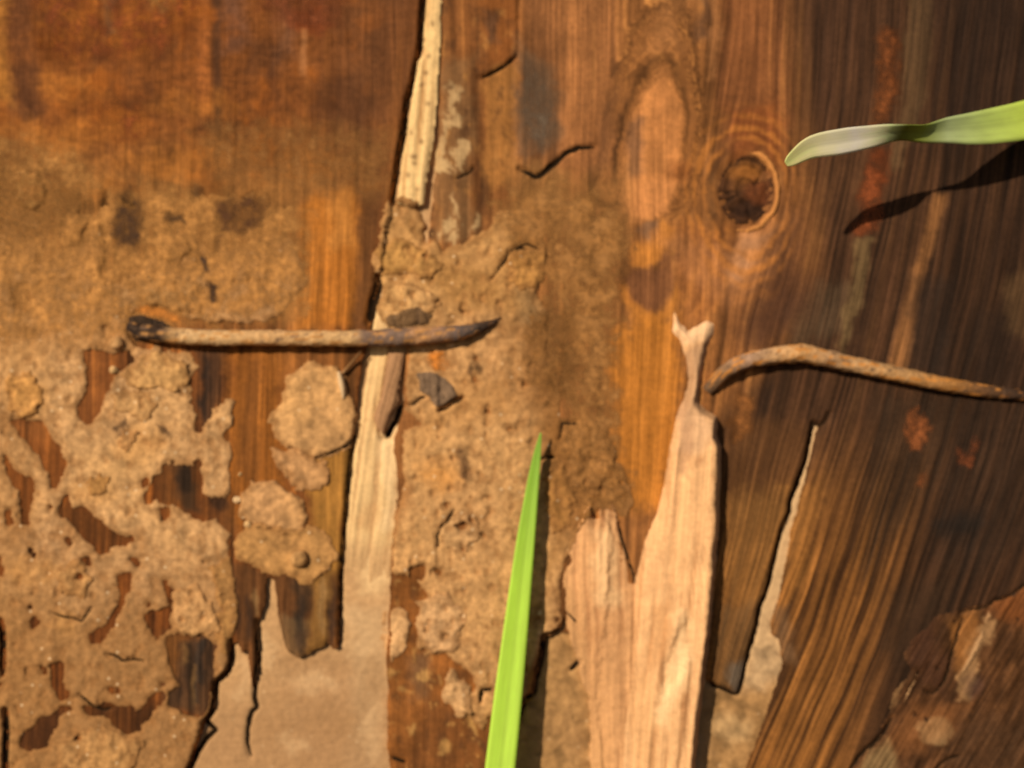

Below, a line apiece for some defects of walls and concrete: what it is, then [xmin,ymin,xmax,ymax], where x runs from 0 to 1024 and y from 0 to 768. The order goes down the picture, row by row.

crack [479,57,516,79]
crack [392,0,426,204]
crack [520,145,595,179]
crack [367,279,383,322]
peeling [373,237,444,315]
peeling [542,463,578,534]
crack [709,414,829,695]
peeling [171,583,221,637]
peeling [414,591,467,654]
peeling [441,668,473,718]
peeling [857,587,1024,768]
peeling [55,725,146,768]